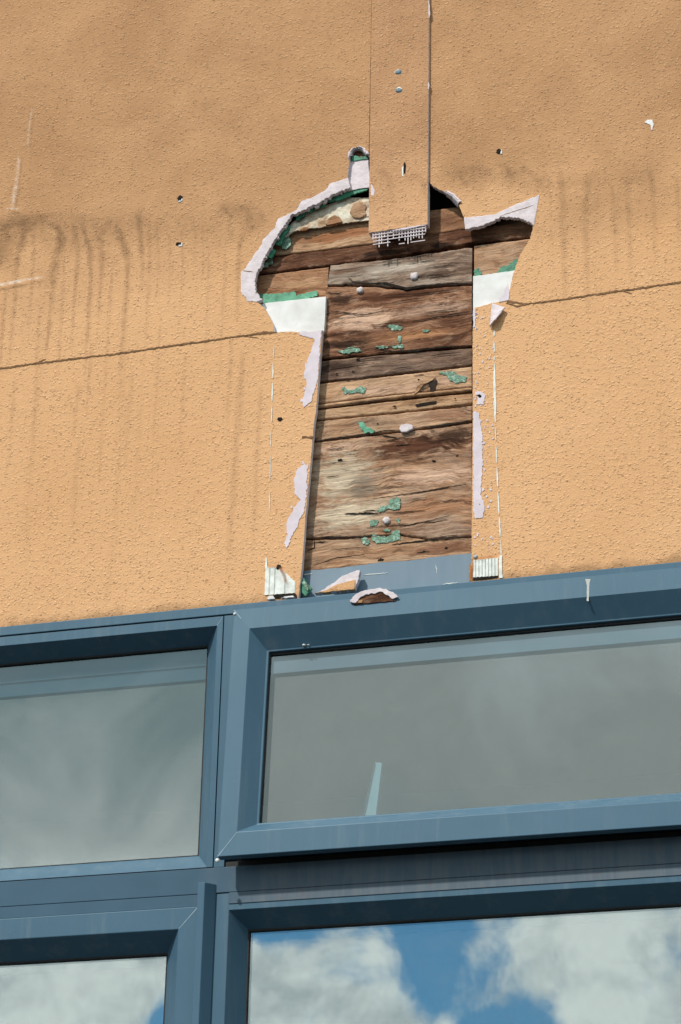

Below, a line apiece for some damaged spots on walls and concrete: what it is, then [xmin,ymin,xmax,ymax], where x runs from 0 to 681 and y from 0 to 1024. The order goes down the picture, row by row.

flaking render [241,146,375,304]
flaking render [444,190,540,231]
peeling [473,258,518,336]
crack [506,281,681,307]
crack [0,331,277,369]
peeling [299,330,322,407]
peeling [341,386,366,394]
peeling [376,324,404,349]
peeling [439,346,503,580]
peeling [284,461,308,549]
peeling [361,497,401,545]
flaking render [264,558,297,601]